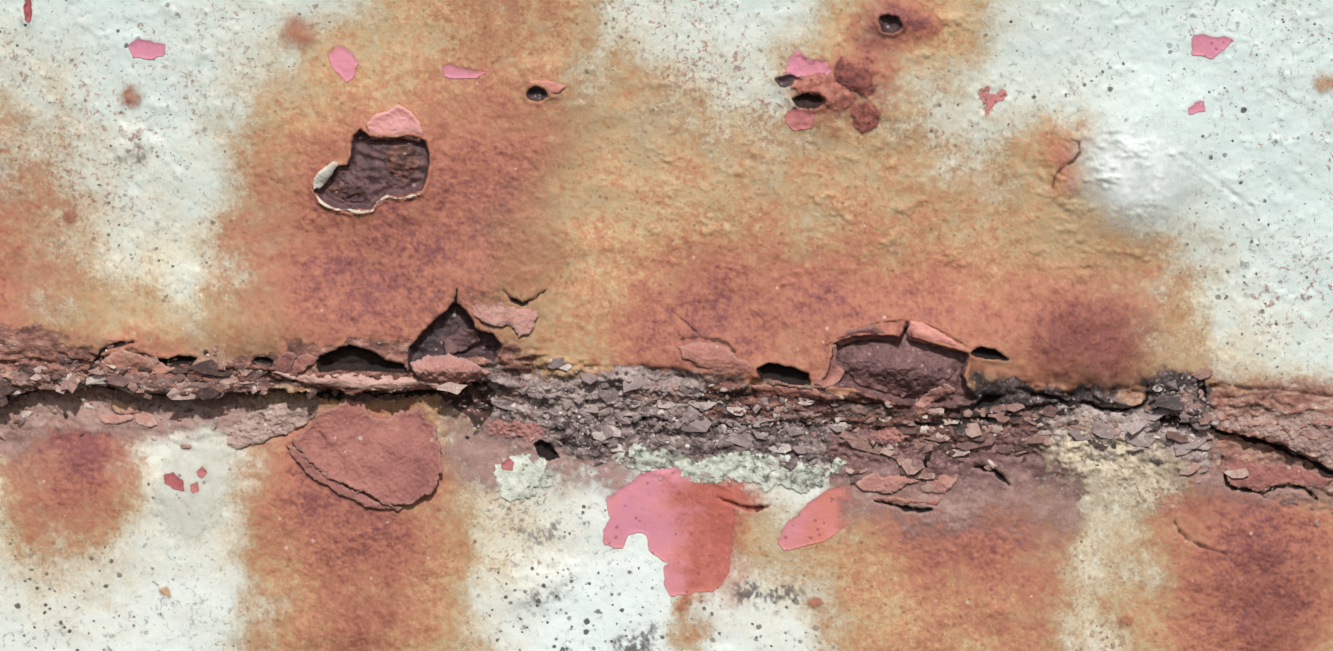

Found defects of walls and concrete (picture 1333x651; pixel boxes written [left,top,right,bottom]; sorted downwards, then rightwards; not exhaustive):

peeling [785,108,815,131]
peeling [774,49,831,87]
peeling [469,302,538,337]
rust [0,0,1192,565]
peeling [98,399,158,427]
rust [233,389,634,651]
peeling [603,466,735,596]
peeling [778,486,852,550]
rust [689,479,1077,651]
rust [1096,375,1333,651]